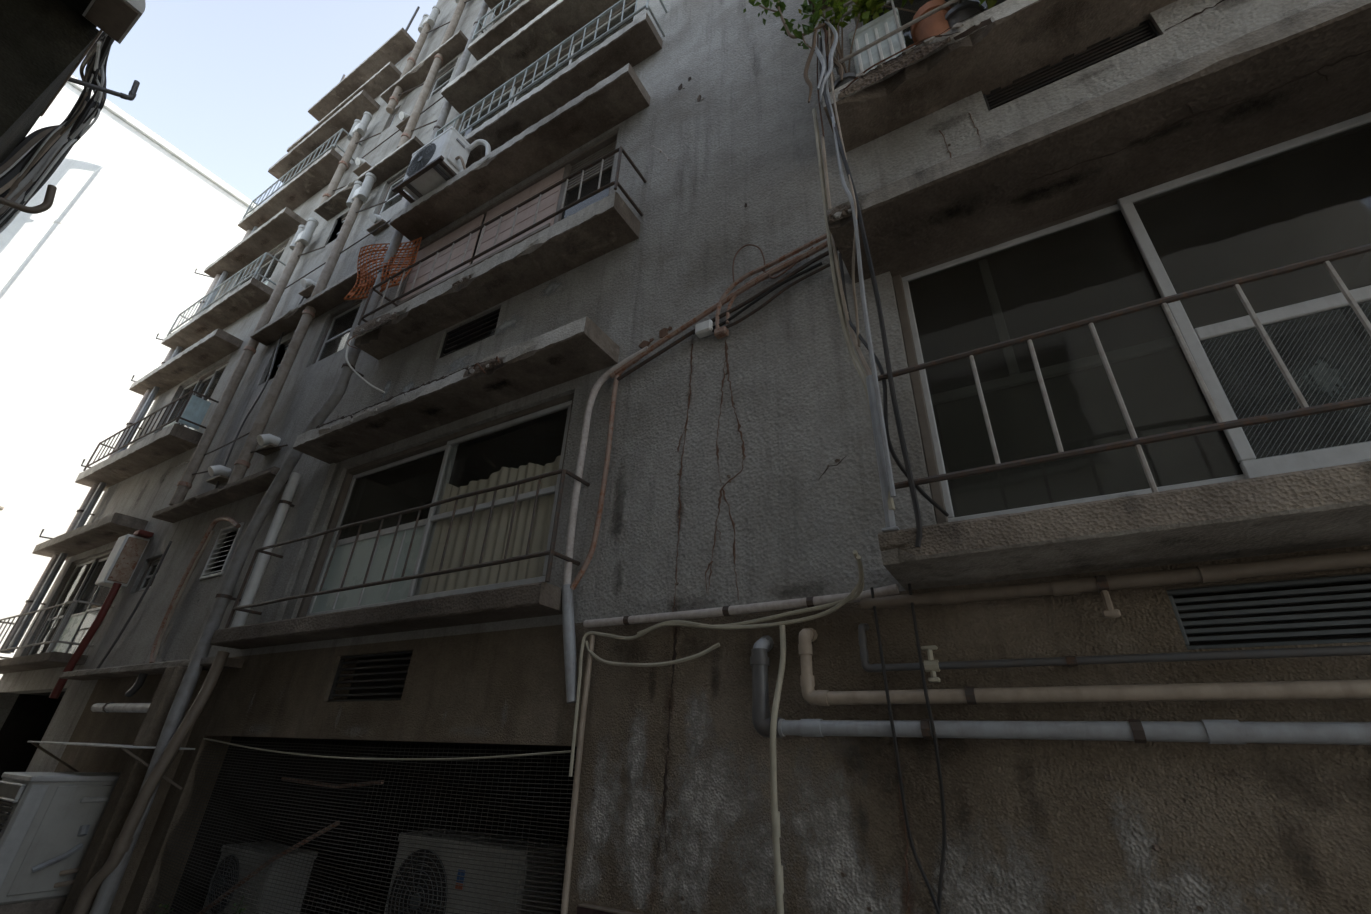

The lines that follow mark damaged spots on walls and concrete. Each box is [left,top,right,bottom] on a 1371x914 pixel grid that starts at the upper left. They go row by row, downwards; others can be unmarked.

crack [653,338,746,880]